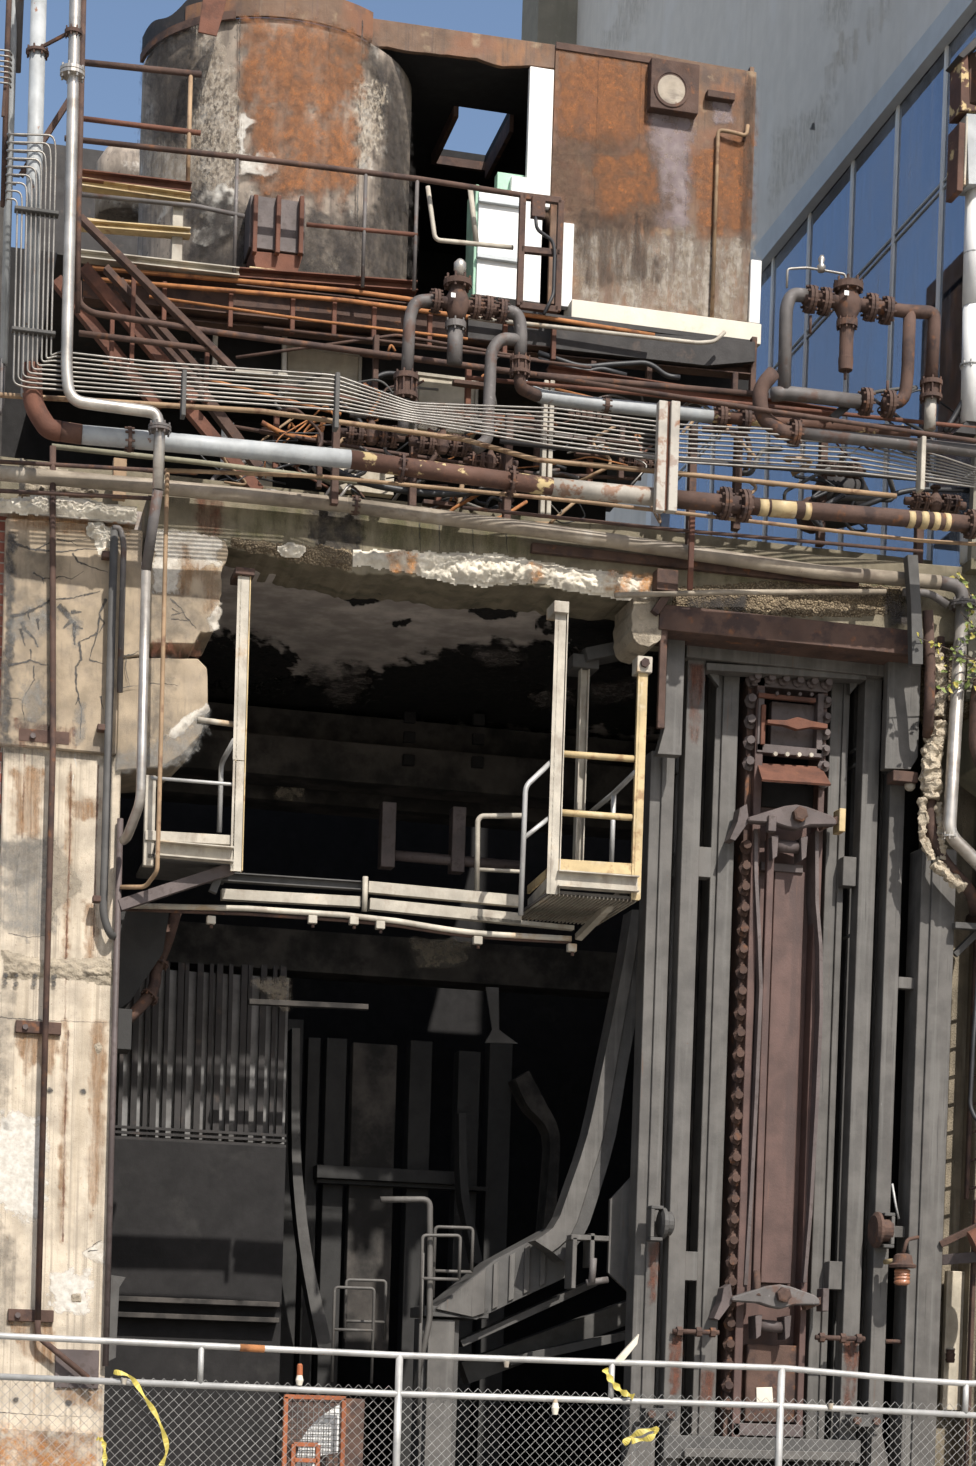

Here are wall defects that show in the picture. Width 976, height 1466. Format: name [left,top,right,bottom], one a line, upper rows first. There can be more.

rust [255,107,360,194]
rust [693,80,754,235]
rust [576,153,658,284]
spalling [152,530,653,601]
crack [7,538,177,739]
peeling [207,601,222,630]
spalling [169,703,210,739]